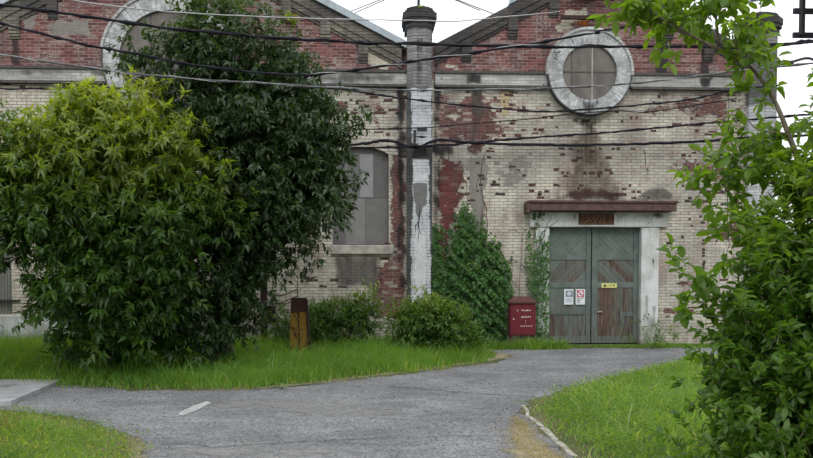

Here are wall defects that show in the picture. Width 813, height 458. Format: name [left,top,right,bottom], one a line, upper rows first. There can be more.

peeling [331,88,558,164]
leakage [558,187,619,200]
leakage [638,189,671,200]
peeling [362,153,505,319]
leakage [338,259,378,287]